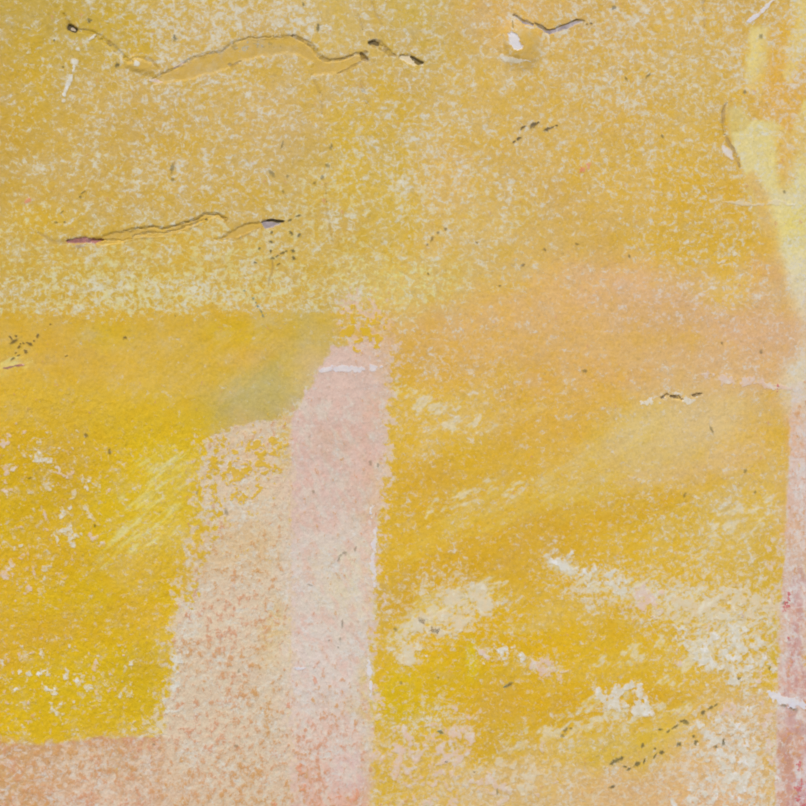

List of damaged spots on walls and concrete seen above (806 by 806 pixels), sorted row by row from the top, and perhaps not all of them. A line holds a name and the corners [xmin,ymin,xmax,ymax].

crack [63,0,425,113]
spalling [512,13,593,45]
crack [36,212,228,249]
crack [637,386,703,409]
peeling [0,421,112,602]
peeling [200,430,290,508]
peeling [0,636,135,732]
peeling [132,650,185,742]
peeling [389,581,504,667]
peeling [476,638,570,685]
peeling [540,546,792,806]
peeling [356,703,570,806]